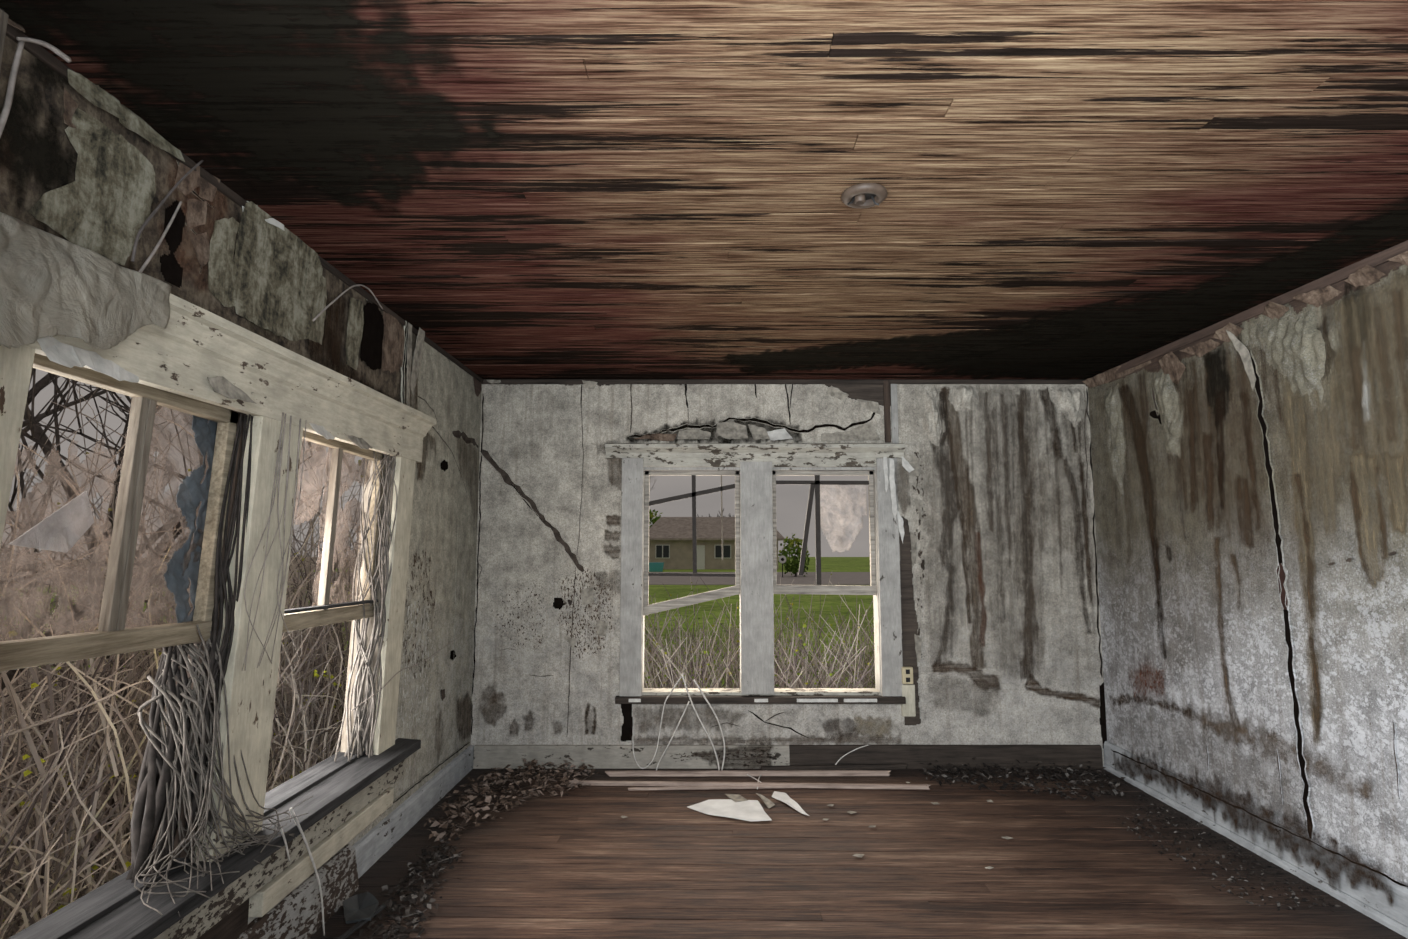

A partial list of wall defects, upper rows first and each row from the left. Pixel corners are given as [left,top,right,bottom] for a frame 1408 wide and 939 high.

flaking render [175,161,220,274]
flaking render [381,311,412,407]
crack [627,384,635,433]
crack [682,384,690,422]
crack [754,384,793,425]
crack [1150,388,1162,426]
damp [723,198,1408,799]
crack [387,385,585,810]
crack [1226,330,1408,887]
crack [1111,744,1209,792]